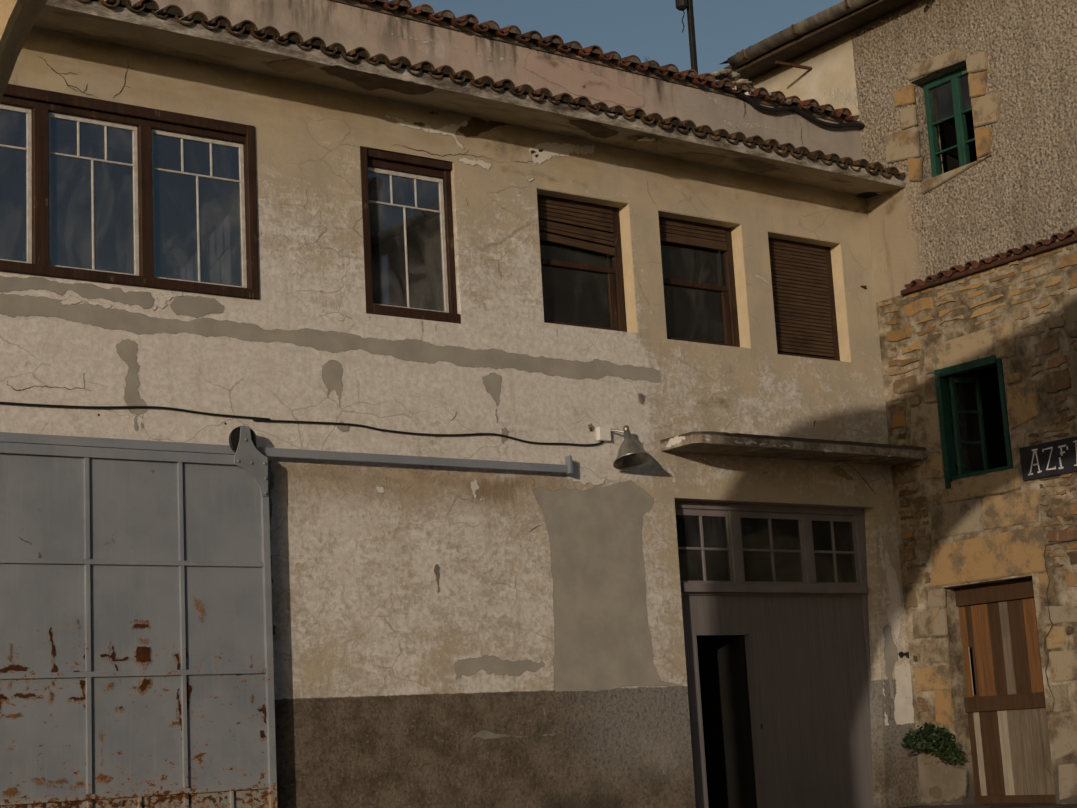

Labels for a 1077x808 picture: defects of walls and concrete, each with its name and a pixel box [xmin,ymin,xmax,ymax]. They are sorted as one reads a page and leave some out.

crack [37,55,130,98]
flaking render [373,111,511,171]
peeling [528,119,619,164]
peeling [153,292,183,311]
crack [7,375,87,391]
rust [0,644,35,718]
rust [49,627,58,672]
rust [68,644,86,709]
rust [100,620,152,694]
rust [172,683,192,731]
rust [251,695,267,739]
rust [3,787,34,808]